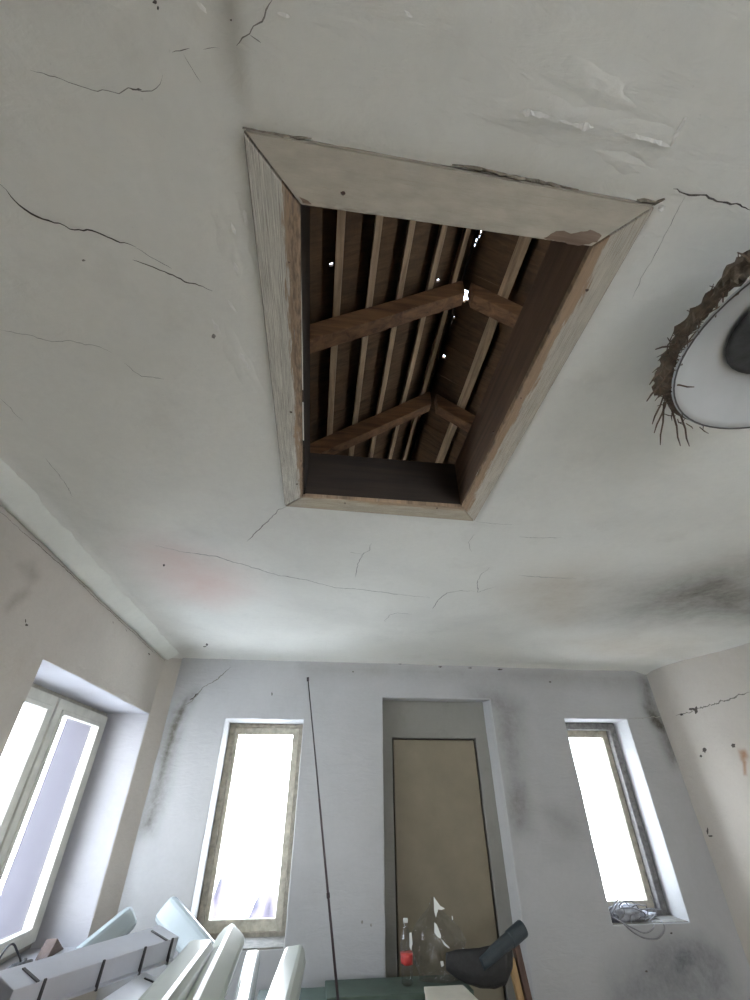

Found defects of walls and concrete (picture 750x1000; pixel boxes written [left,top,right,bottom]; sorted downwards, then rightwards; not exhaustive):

crack [31,70,163,94]
crack [174,0,272,81]
crack [0,184,212,291]
crack [633,189,749,296]
crack [183,669,229,707]
leakage [288,541,750,777]
crack [676,692,748,716]
leakage [134,679,208,848]